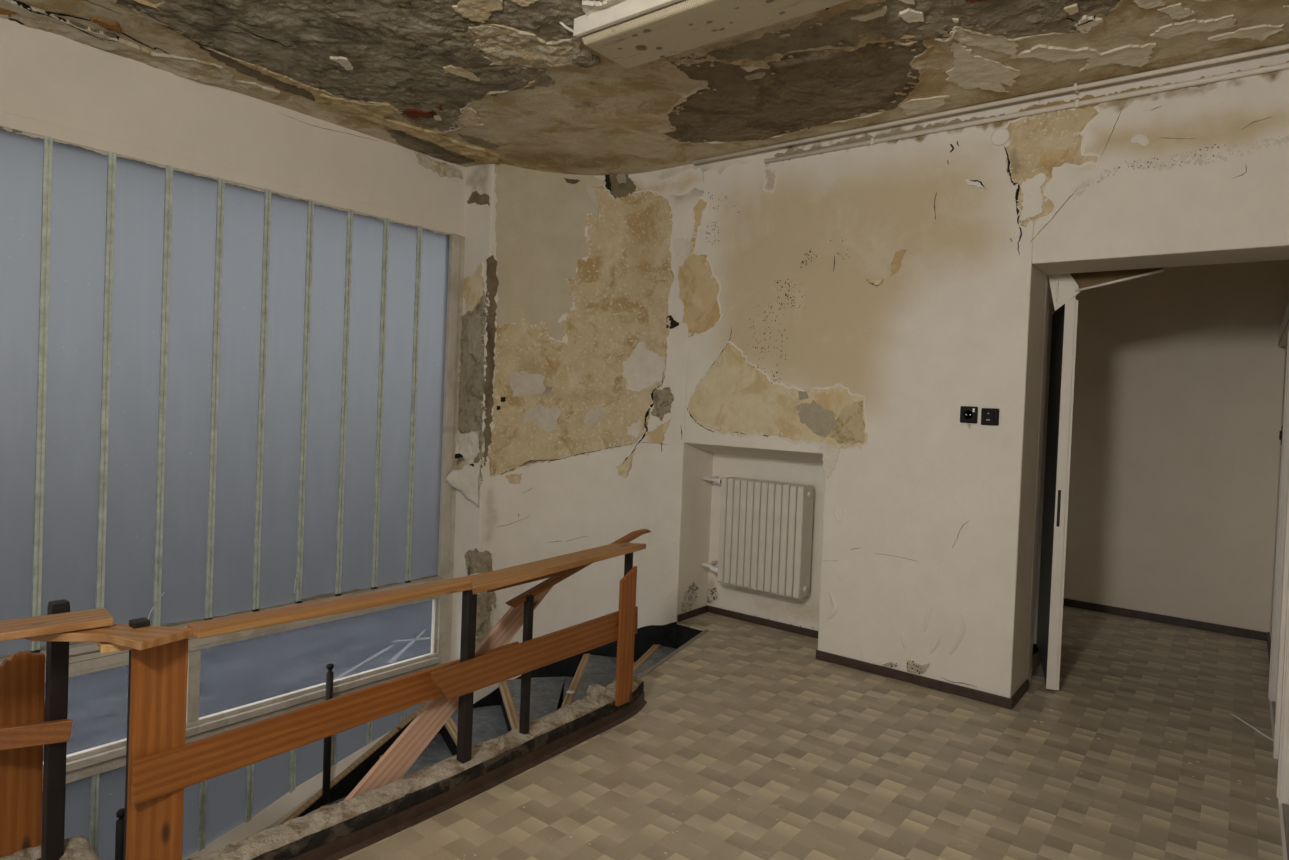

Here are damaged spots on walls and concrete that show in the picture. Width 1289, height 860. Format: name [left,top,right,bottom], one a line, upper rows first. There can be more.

crack [8,0,294,55]
spalling [0,0,625,179]
spalling [656,0,1289,228]
crack [1004,146,1077,255]
peeling [446,174,722,507]
crack [494,331,781,527]
peeling [688,340,870,479]
spalling [464,548,493,576]
spalling [475,591,500,648]